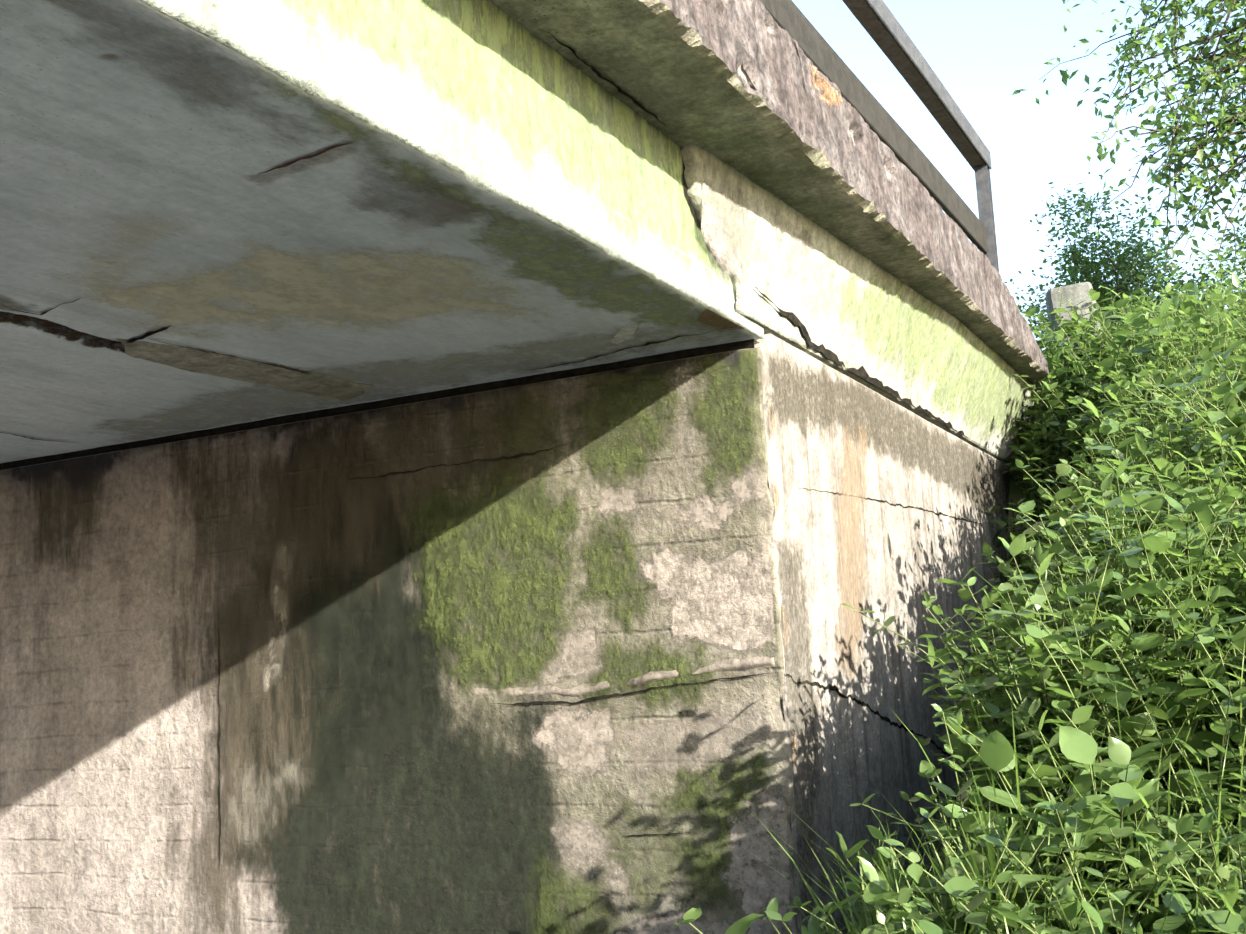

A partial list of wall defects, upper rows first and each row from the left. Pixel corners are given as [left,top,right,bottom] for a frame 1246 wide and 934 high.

crack [525,34,985,448]
water stain [97,249,523,326]
corrosion [699,308,743,332]
water stain [4,451,122,567]
crack [348,442,573,480]
peeling [672,468,780,530]
crack [796,487,983,524]
water stain [104,328,741,934]
peeling [535,627,603,683]
peeling [640,536,788,652]
peeling [532,704,616,776]
crack [489,671,952,758]